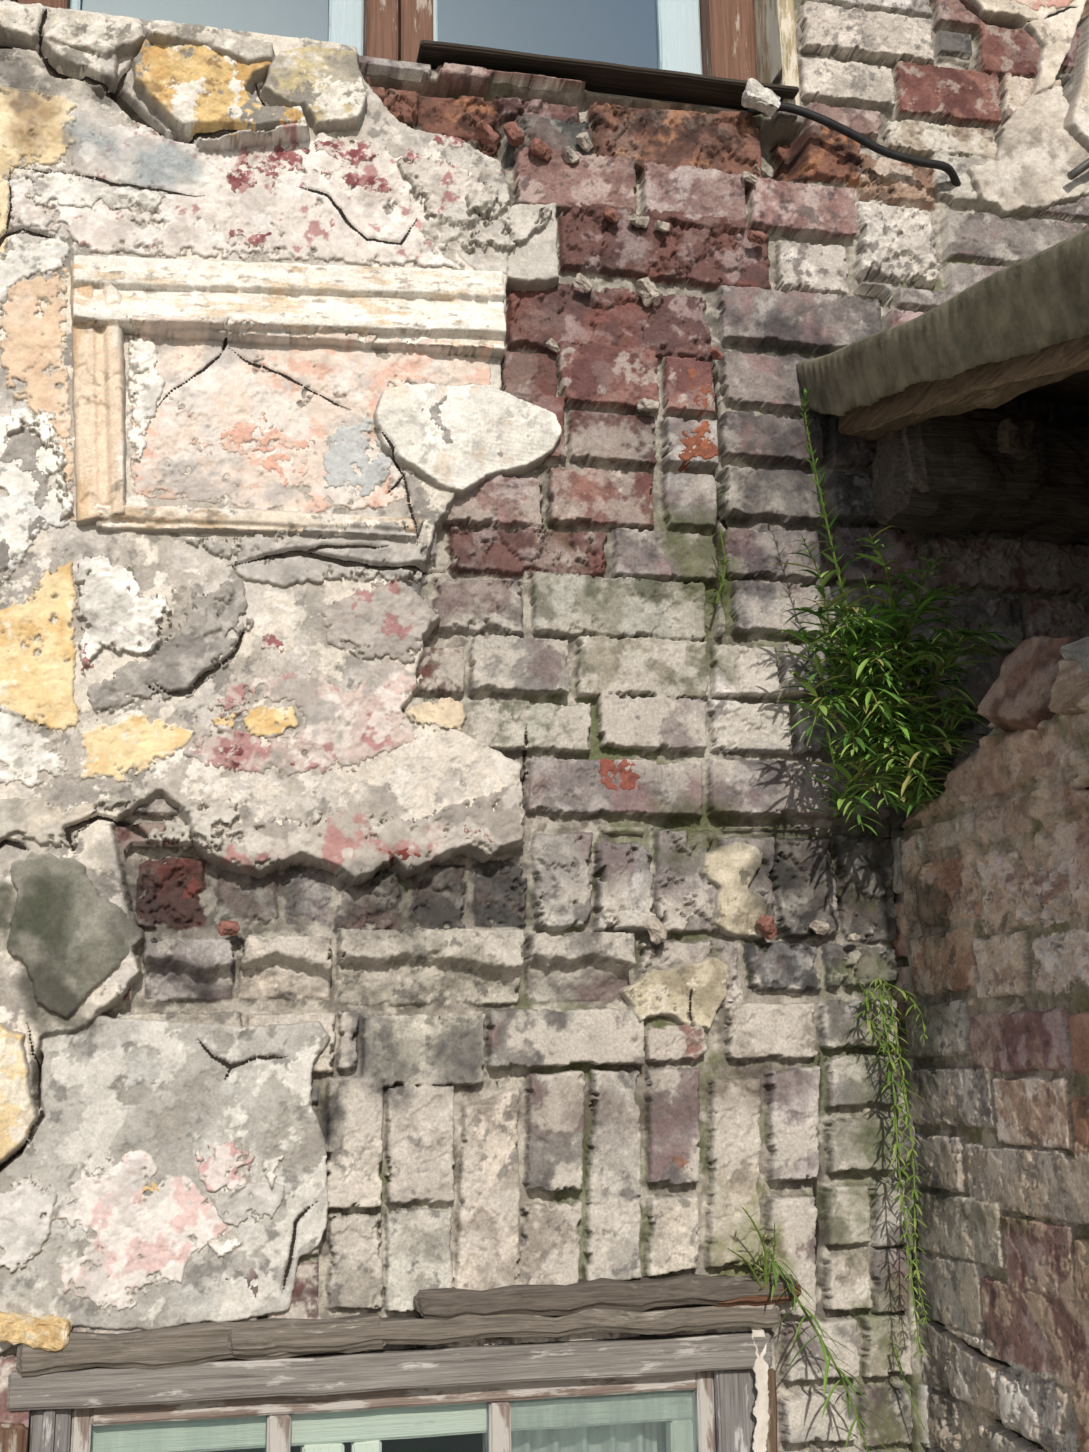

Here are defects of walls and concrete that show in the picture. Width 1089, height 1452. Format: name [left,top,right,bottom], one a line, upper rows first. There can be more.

crack [0,9,265,144]
crack [0,165,205,246]
crack [296,186,417,245]
peeling [0,75,946,330]
crack [157,338,443,575]
spalling [678,368,719,474]
peeling [0,314,494,849]
spalling [599,758,645,791]
spalling [100,782,903,1018]
crack [0,1024,45,1170]
crack [198,1039,288,1080]
peeling [0,1141,285,1316]